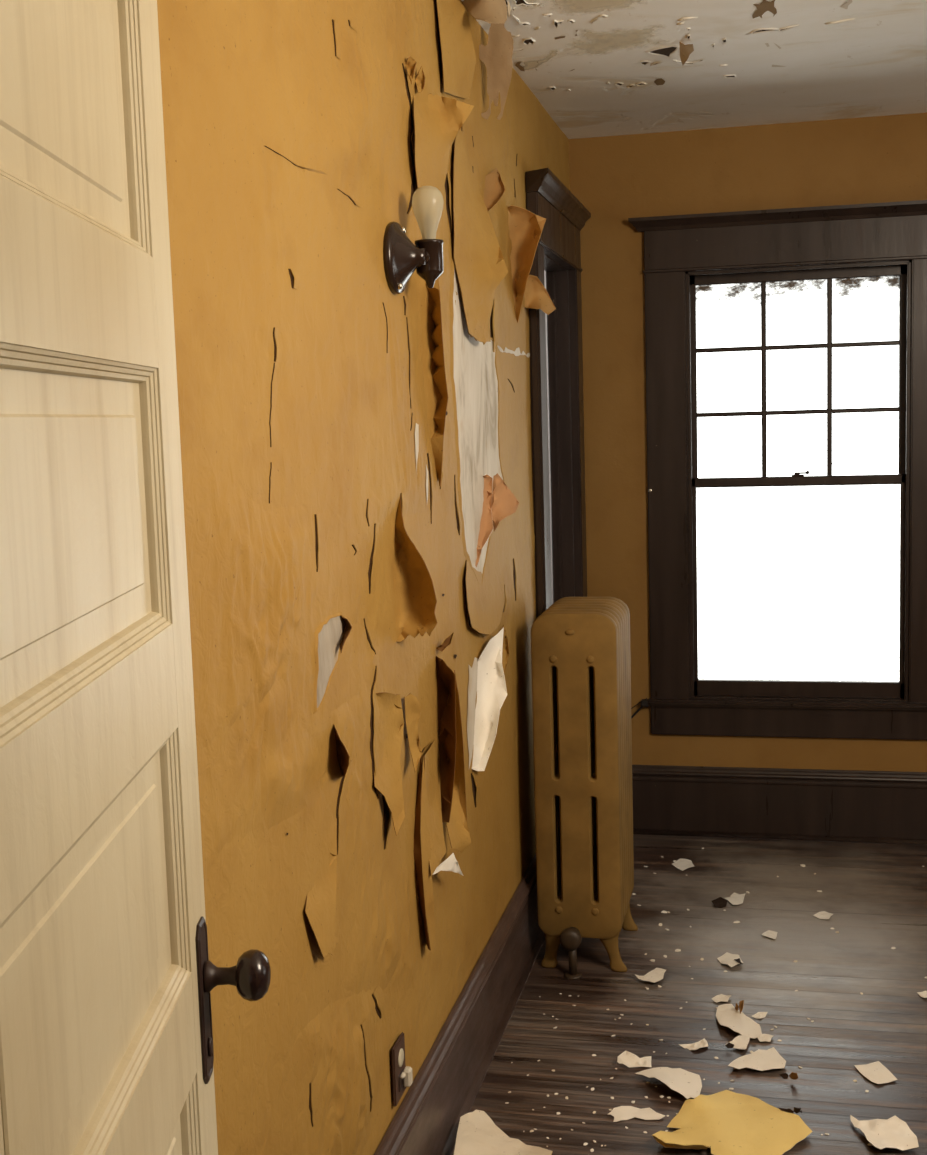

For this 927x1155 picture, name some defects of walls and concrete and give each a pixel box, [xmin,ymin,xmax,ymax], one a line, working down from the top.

spalling [512,0,578,46]
spalling [606,17,705,88]
spalling [752,0,777,18]
crack [265,146,363,209]
crack [269,327,283,503]
flaking render [374,0,556,951]
flaking render [313,612,352,714]
peeling [334,725,350,776]
peeling [305,818,337,958]
crack [361,986,388,1112]